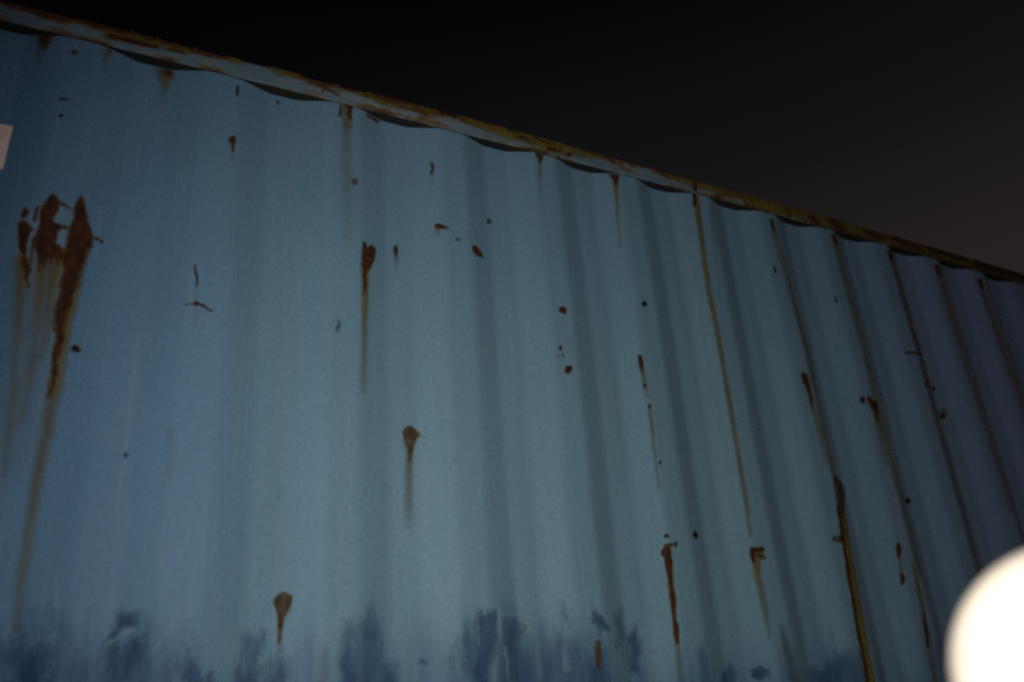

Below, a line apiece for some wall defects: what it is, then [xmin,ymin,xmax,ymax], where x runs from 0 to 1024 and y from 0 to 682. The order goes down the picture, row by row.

corrosion [81,19,197,55]
corrosion [317,82,353,125]
corrosion [462,116,603,163]
corrosion [17,194,103,438]
corrosion [360,242,376,330]
corrosion [667,175,1024,365]
corrosion [724,379,735,440]
corrosion [403,426,420,462]
corrosion [274,592,292,642]
corrosion [661,534,679,644]
corrosion [750,546,766,585]
corrosion [832,475,875,682]